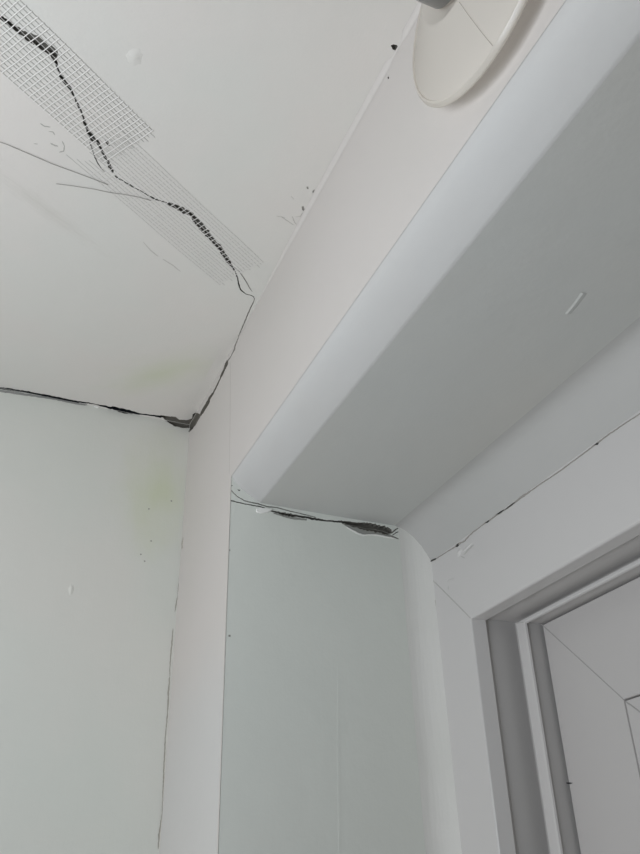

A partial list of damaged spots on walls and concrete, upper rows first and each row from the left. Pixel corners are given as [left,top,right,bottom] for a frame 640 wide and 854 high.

crack [0,16,255,432]
crack [231,485,398,539]
crack [430,413,640,562]